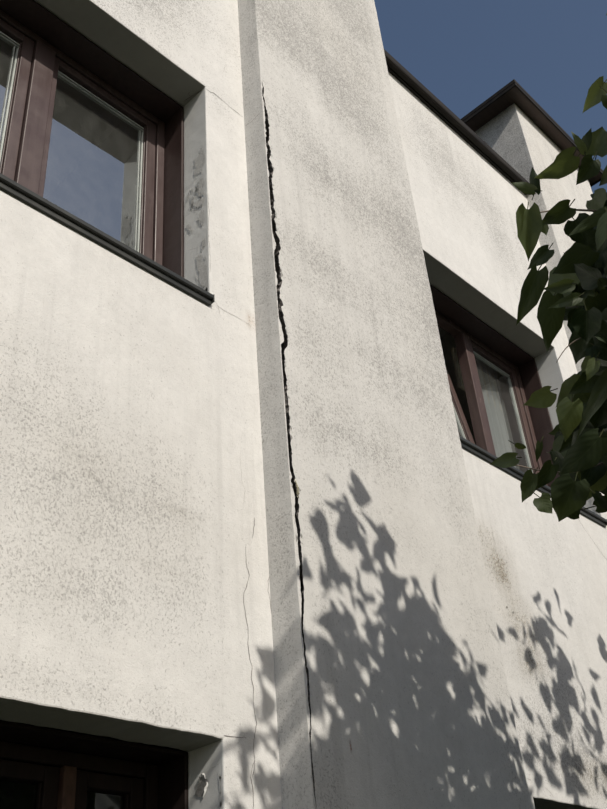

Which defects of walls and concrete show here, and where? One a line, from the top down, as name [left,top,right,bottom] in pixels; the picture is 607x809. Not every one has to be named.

peeling [186,148,205,231]
peeling [195,237,208,291]
crack [183,87,333,807]
peeling [195,771,222,809]